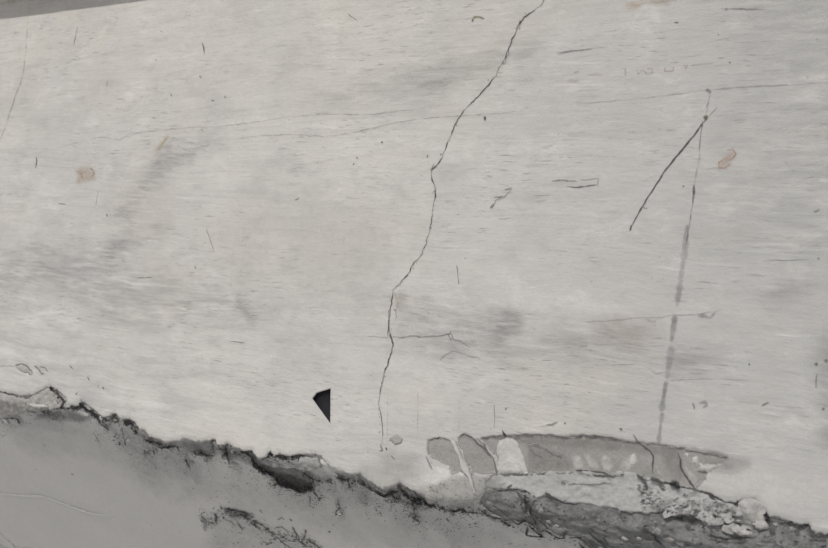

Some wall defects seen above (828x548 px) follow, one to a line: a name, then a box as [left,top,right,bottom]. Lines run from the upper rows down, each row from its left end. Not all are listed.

crack [430,10,534,228]
crack [630,102,716,230]
crack [369,247,465,435]
spalling [0,387,828,548]